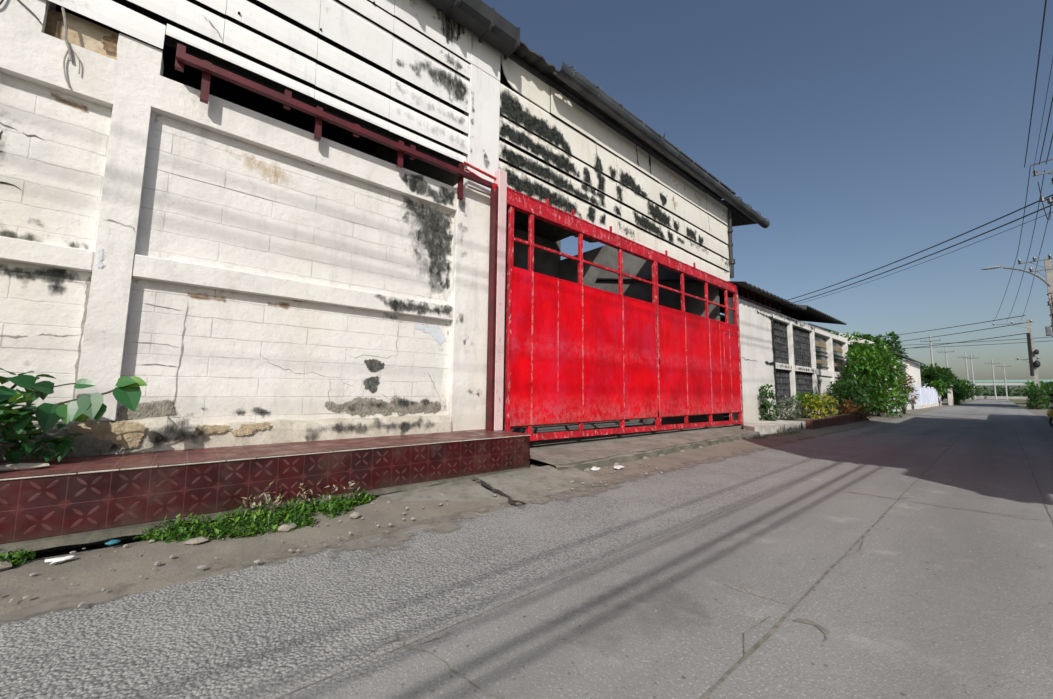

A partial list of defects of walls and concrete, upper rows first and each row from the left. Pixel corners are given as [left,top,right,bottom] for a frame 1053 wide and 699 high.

flaking render [44,8,119,60]
crack [0,122,43,152]
damp [581,156,647,224]
damp [403,174,455,288]
damp [667,220,703,244]
damp [0,266,74,292]
crack [135,303,188,405]
crack [275,409,1053,699]